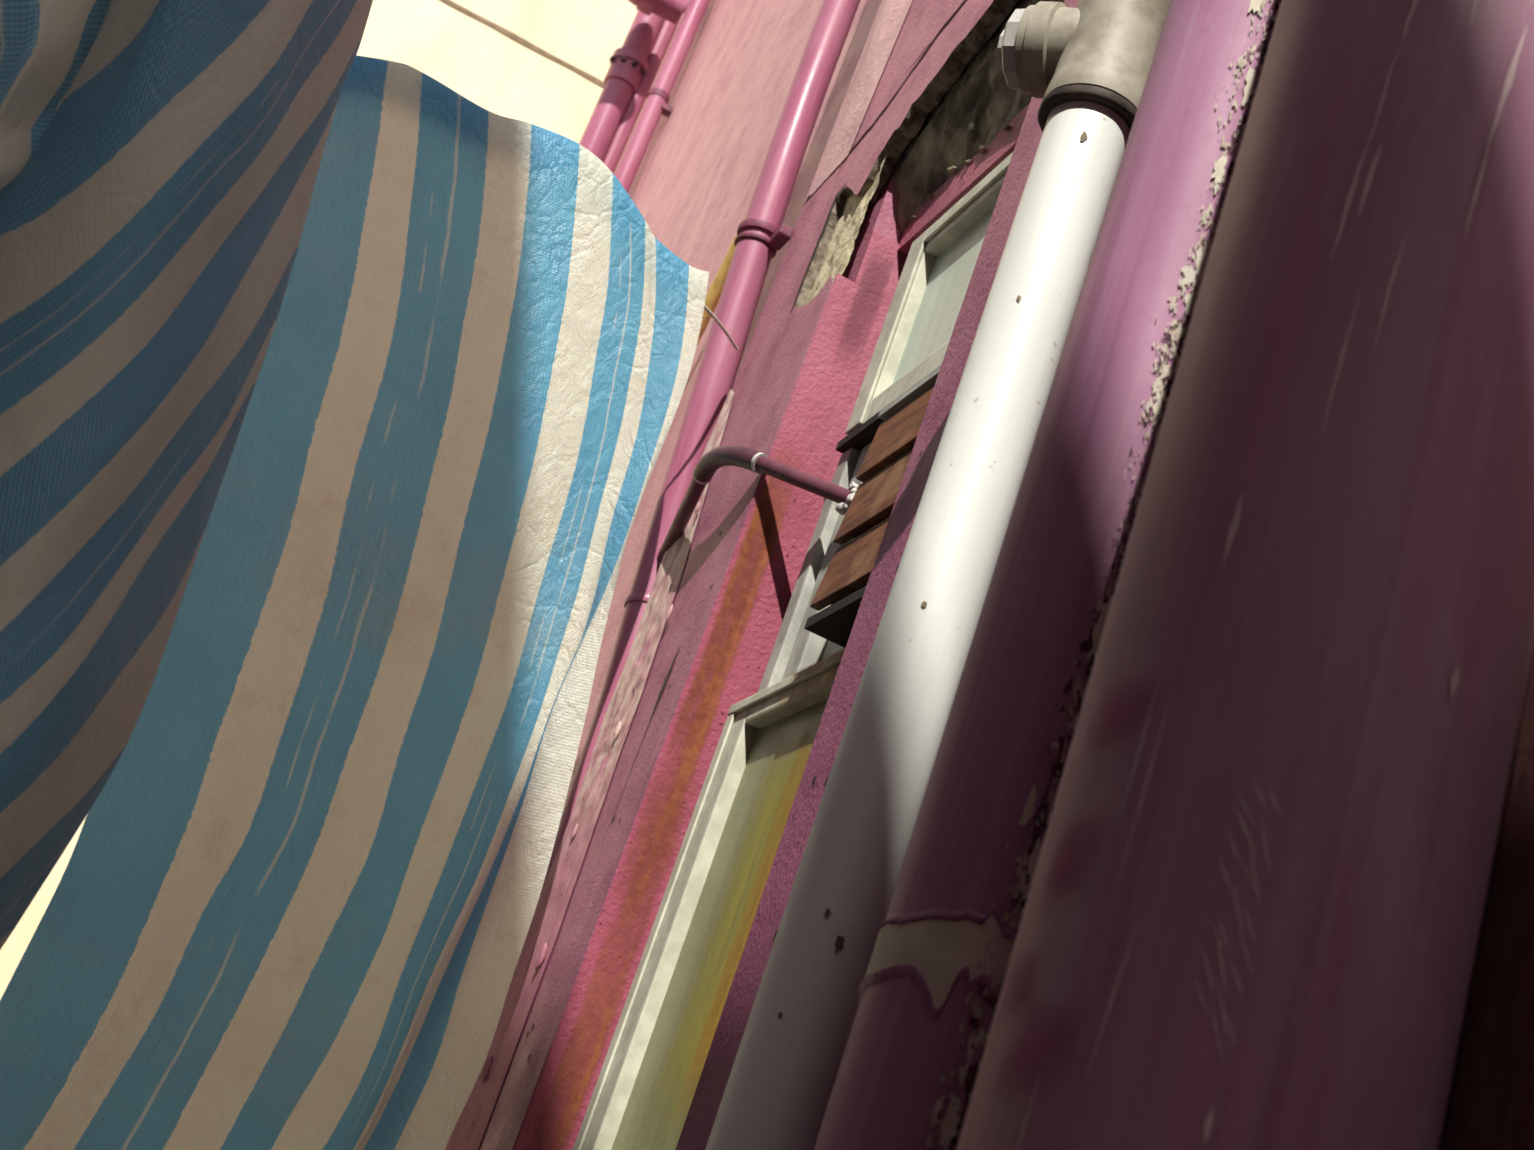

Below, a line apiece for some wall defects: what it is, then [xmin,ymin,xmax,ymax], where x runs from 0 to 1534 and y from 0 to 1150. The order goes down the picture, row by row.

spalling [791,0,1064,311]
peeling [859,0,1279,1150]